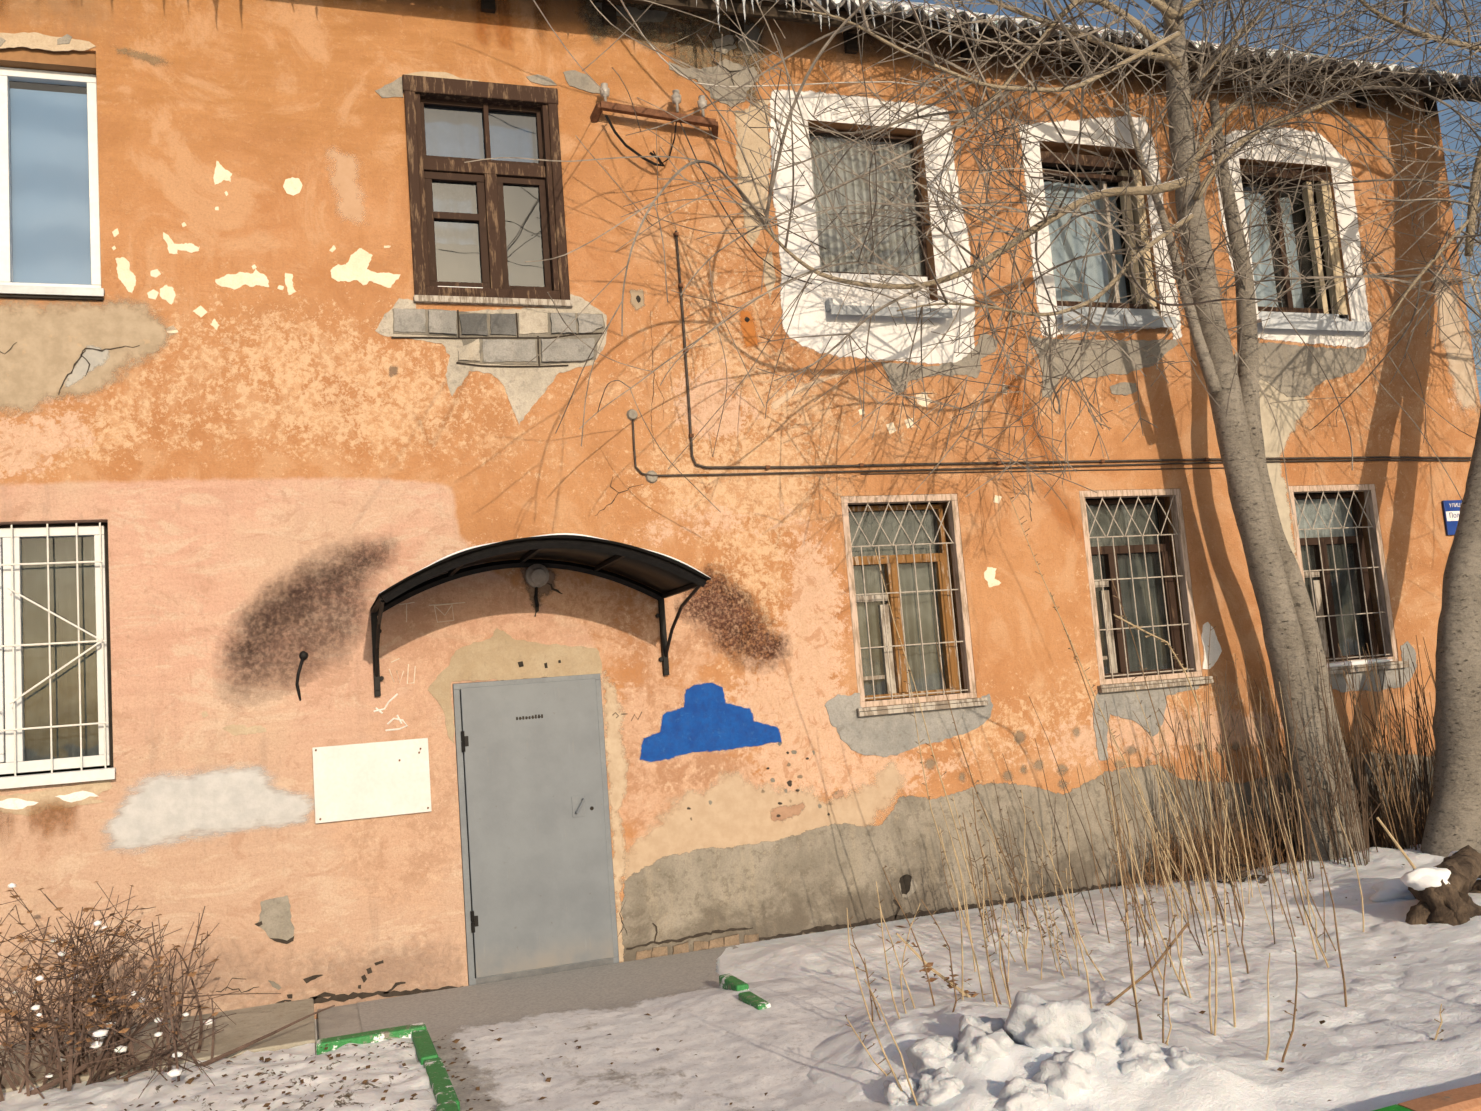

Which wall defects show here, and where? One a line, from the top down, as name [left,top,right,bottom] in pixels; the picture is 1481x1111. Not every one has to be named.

peeling [213,161,232,210]
peeling [283,177,303,196]
peeling [163,222,200,254]
peeling [215,264,296,295]
flaking render [0,228,178,412]
peeling [193,306,219,330]
spalling [329,245,607,424]
crack [58,345,140,395]
flaking render [1259,379,1309,563]
spalling [1348,752,1435,846]
spalling [621,742,1303,962]
spalling [255,895,295,944]